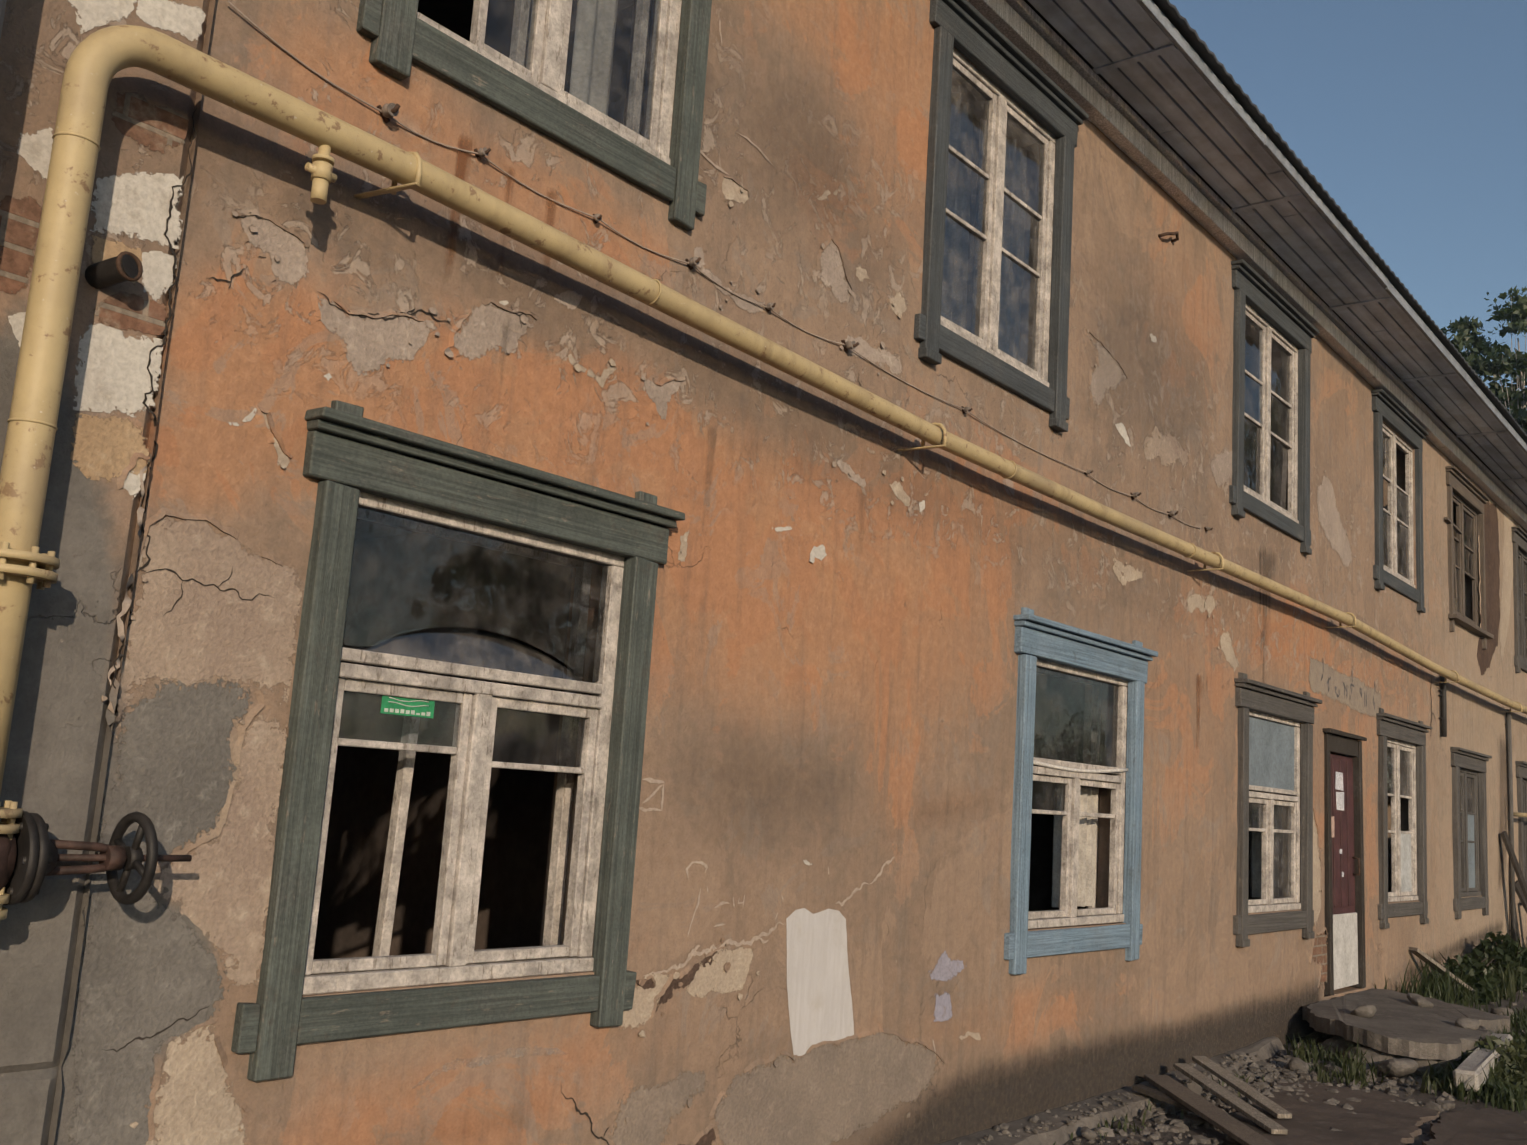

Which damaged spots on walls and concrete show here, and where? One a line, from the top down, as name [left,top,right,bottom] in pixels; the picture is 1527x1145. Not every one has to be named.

spalling [232,210,539,376]
spalling [554,290,582,310]
spalling [817,235,869,303]
crack [108,104,274,705]
spalling [568,354,616,388]
spalling [641,376,685,426]
spalling [1085,327,1127,408]
spalling [619,938,759,1038]
spalling [129,1018,252,1145]
crack [561,1092,609,1145]
spalling [672,1028,945,1145]